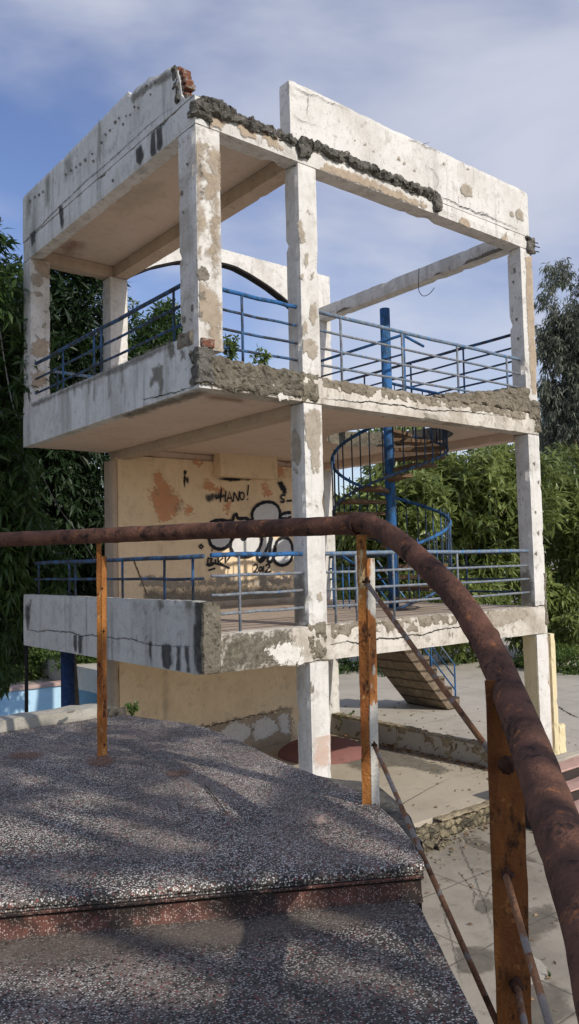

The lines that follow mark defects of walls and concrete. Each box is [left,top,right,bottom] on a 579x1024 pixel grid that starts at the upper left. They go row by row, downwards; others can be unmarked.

damp [136,125,162,165]
spalling [171,65,443,213]
peeling [30,258,50,297]
spalling [177,212,542,497]
crack [334,399,497,416]
peeling [149,469,194,523]
crack [29,629,192,647]
damp [149,642,189,672]
peeling [227,621,358,666]
spalling [376,614,457,633]
peeling [485,606,529,627]
peeling [200,705,295,749]